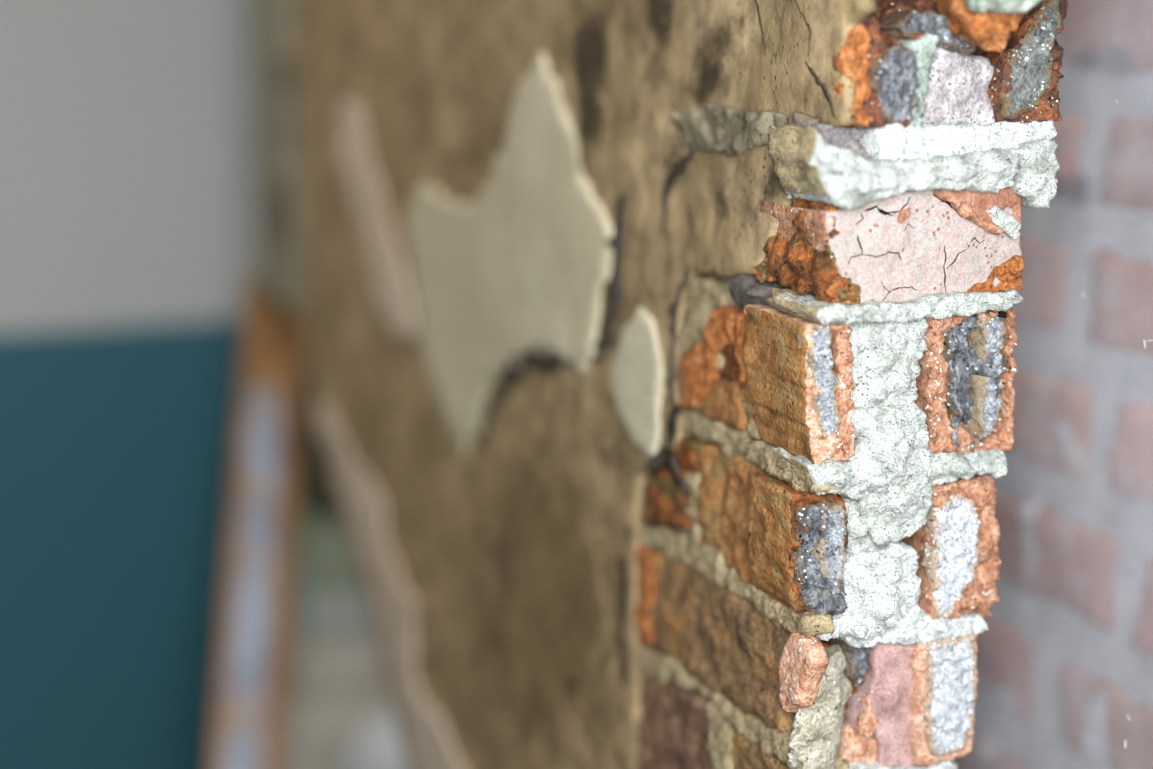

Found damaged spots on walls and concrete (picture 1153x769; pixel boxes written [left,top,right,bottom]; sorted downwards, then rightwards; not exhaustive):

crack [755,0,766,49]
crack [794,0,836,119]
spalling [833,0,1068,129]
peeling [337,51,614,458]
spalling [752,193,861,304]
crack [848,193,957,301]
crack [943,237,984,293]
spalling [679,304,856,465]
spalling [914,309,1018,454]
spalling [748,471,849,617]
spalling [900,474,1001,620]
spalling [778,632,979,767]